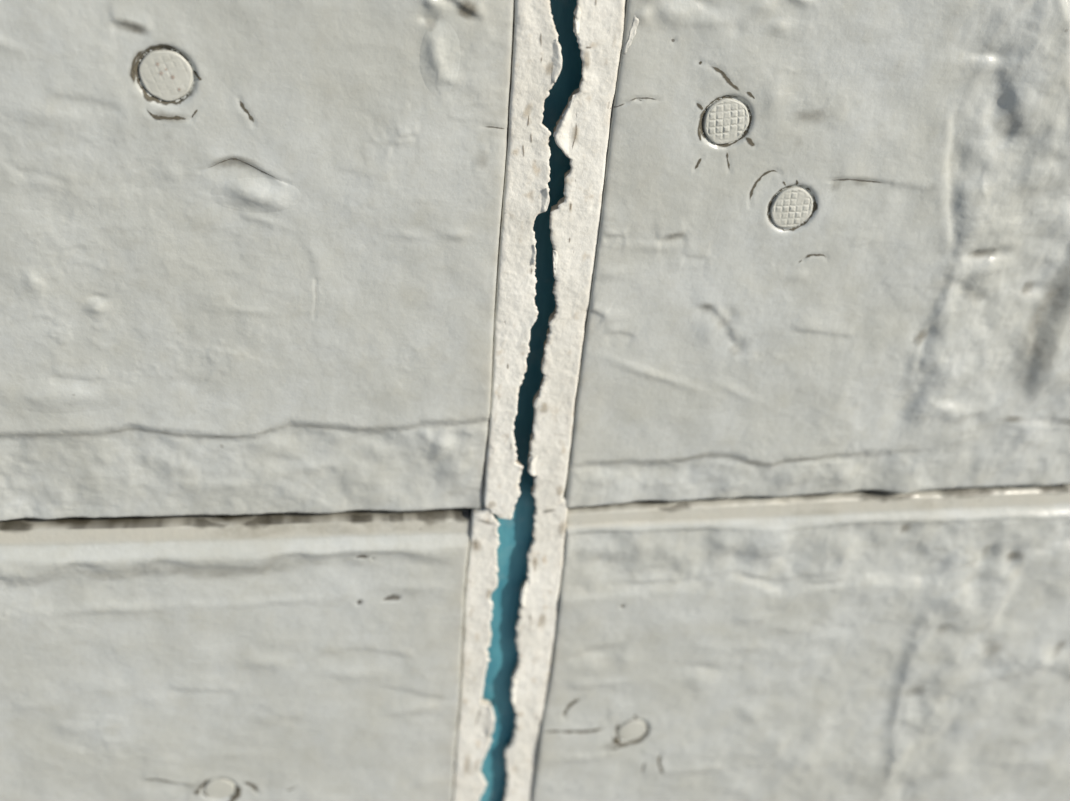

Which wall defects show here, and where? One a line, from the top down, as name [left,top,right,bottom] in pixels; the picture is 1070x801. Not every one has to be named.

crack [476,0,662,800]